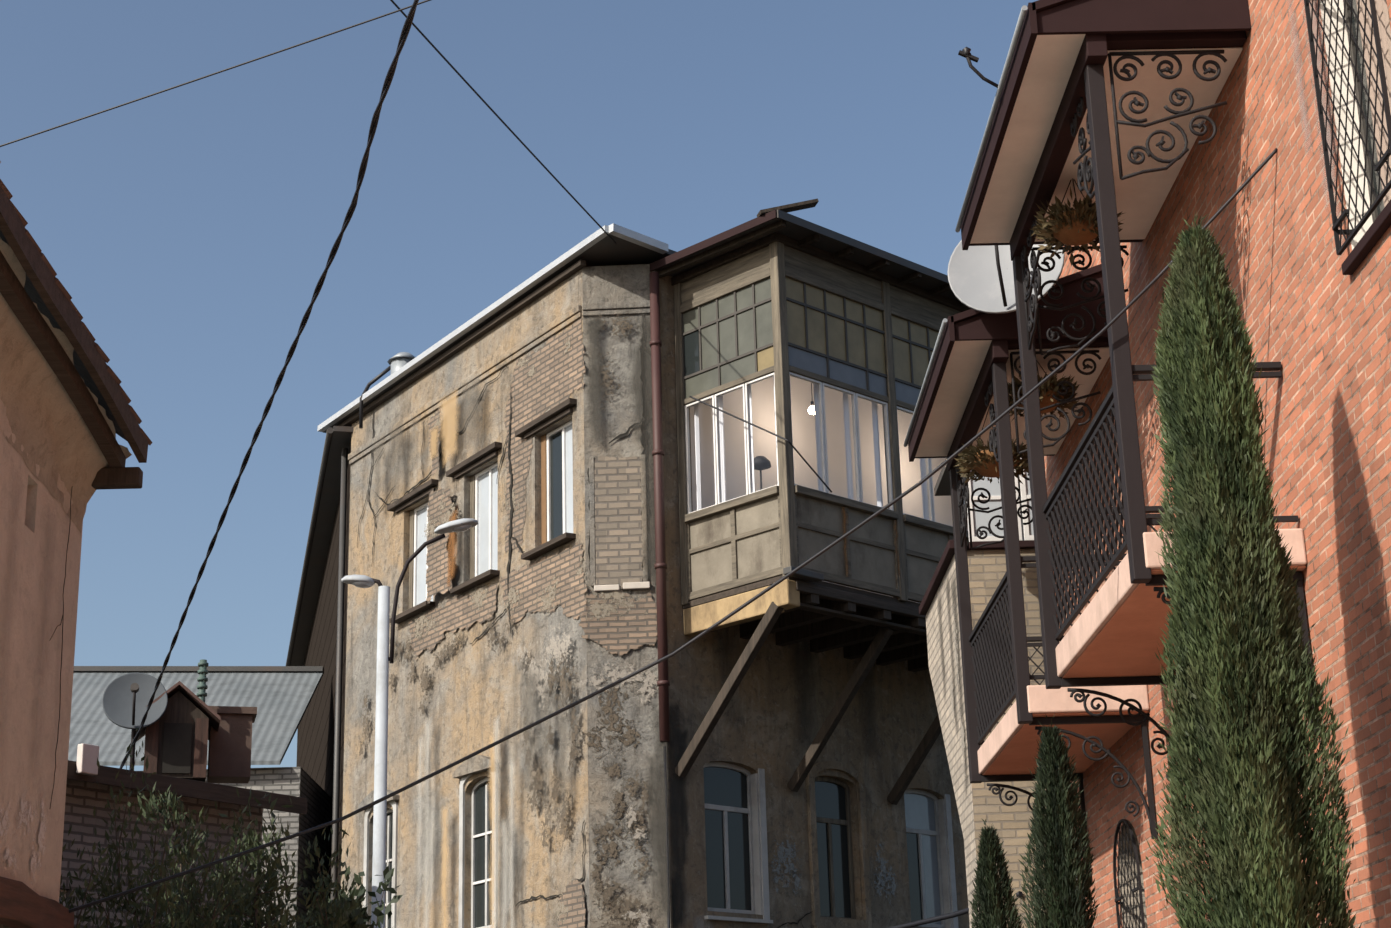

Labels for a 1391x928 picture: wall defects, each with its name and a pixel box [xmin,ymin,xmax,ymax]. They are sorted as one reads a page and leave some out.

crack [49,486,73,808]
crack [357,366,525,644]
flaking render [388,313,664,928]